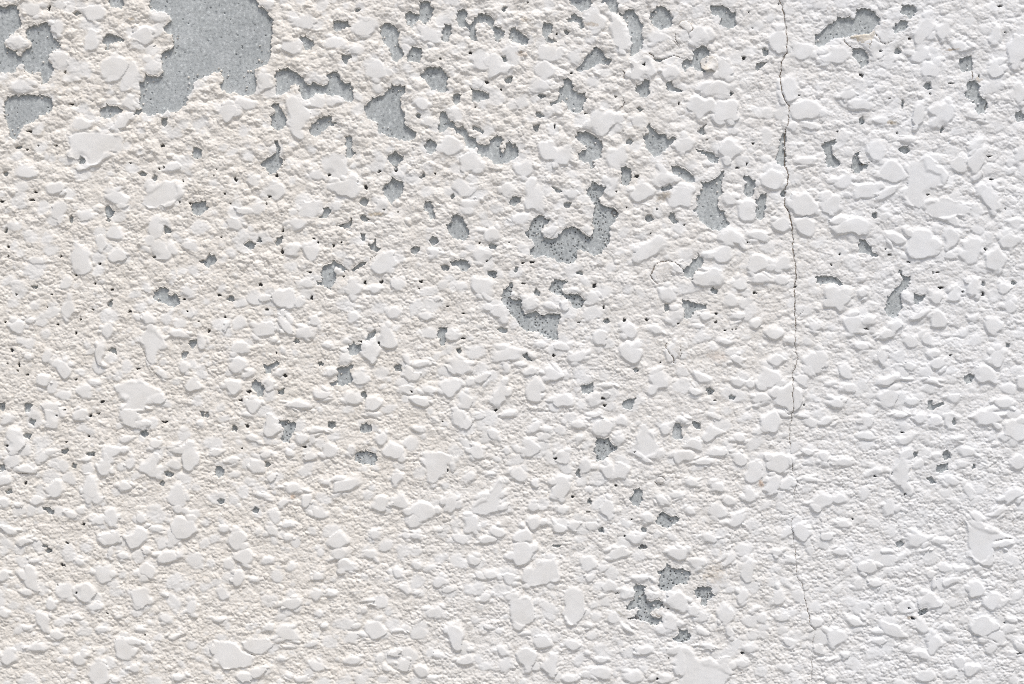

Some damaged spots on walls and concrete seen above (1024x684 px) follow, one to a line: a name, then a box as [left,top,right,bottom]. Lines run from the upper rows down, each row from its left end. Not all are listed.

peeling [0,3,61,149]
peeling [100,0,529,205]
peeling [815,7,880,69]
peeling [525,130,619,309]
peeling [661,148,729,231]
peeling [743,174,766,220]
peeling [497,267,561,340]
crack [779,0,815,675]
peeling [884,271,925,319]
peeling [626,563,716,625]